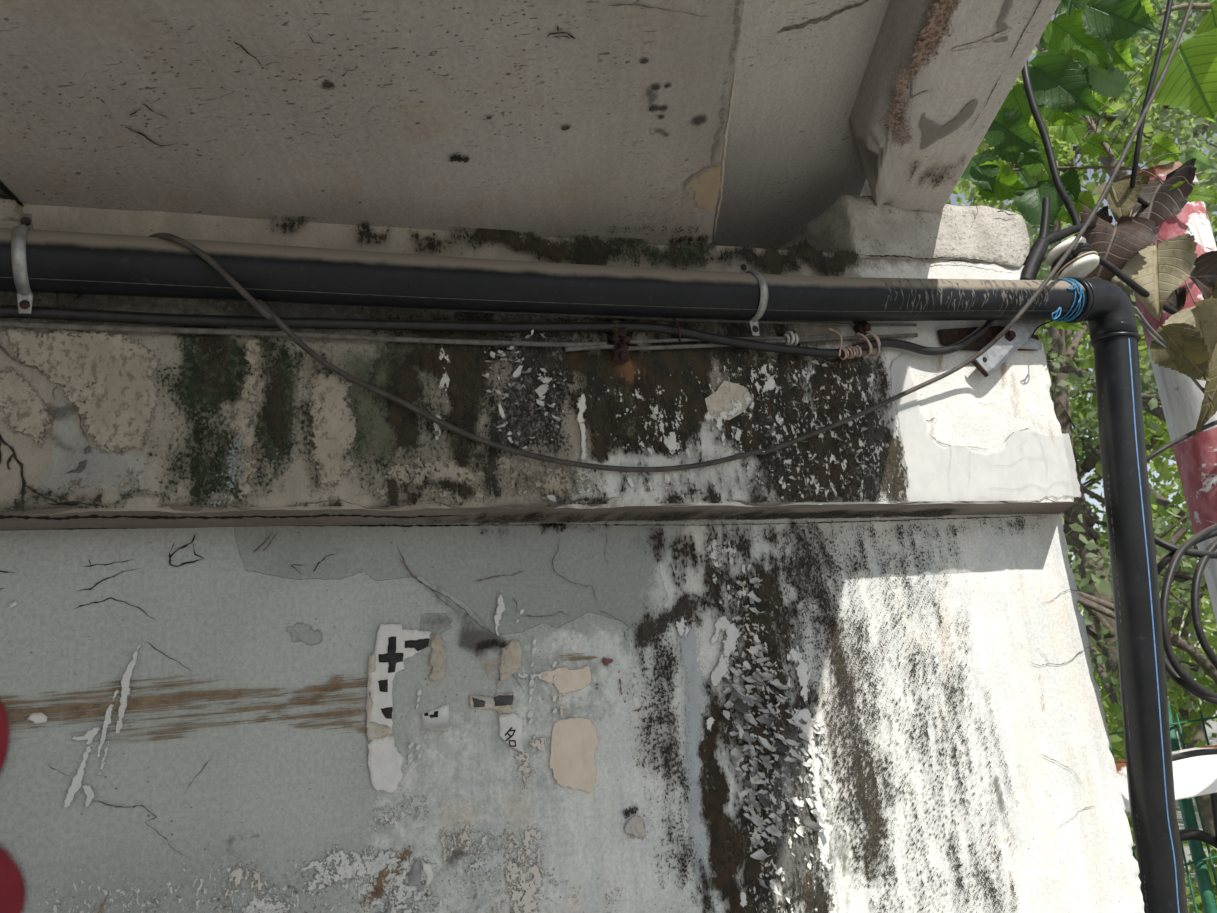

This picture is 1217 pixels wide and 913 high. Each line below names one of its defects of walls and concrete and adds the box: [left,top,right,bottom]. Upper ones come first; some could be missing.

spalling [879,0,961,150]
crack [0,344,89,444]
peeling [0,327,161,497]
leakage [144,326,342,507]
peeling [223,328,269,507]
peeling [306,369,358,493]
crack [926,418,1031,450]
crack [77,558,188,669]
crack [0,434,1067,637]
leakage [313,308,1081,913]
peeling [38,666,599,913]
peeling [701,537,840,913]